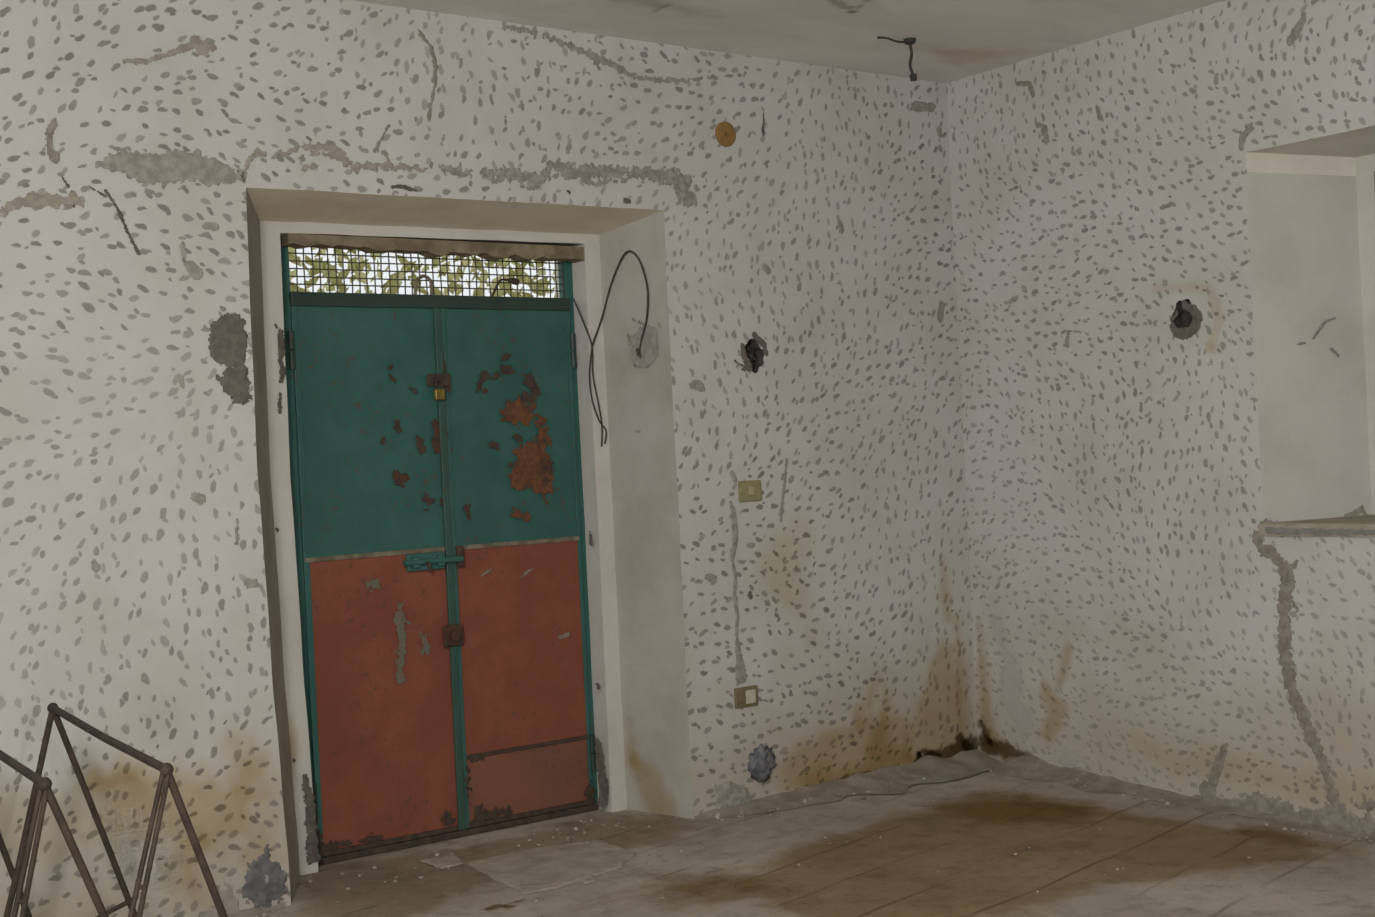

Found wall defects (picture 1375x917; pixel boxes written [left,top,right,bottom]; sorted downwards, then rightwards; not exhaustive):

peeling [215,352,253,405]
rust [380,418,448,454]
rust [476,353,555,522]
rust [392,470,410,488]
crack [1252,518,1343,807]
water stain [915,731,1025,761]